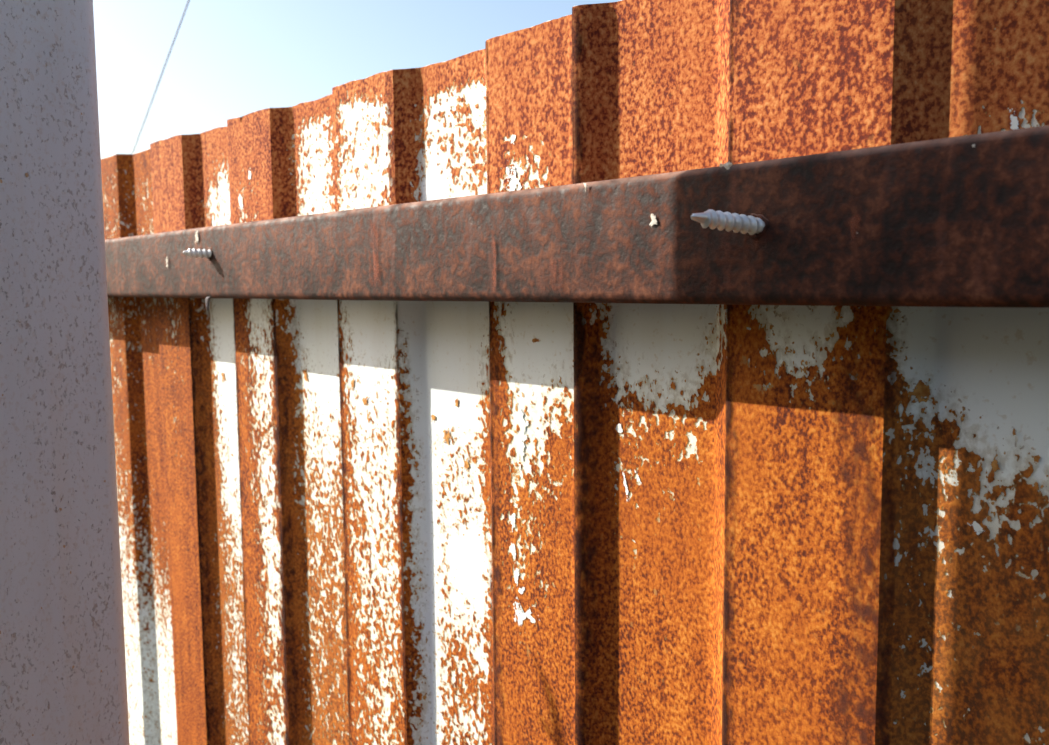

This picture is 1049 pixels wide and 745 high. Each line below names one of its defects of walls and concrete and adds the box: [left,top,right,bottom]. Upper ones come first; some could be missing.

rust [104,297,1049,745]